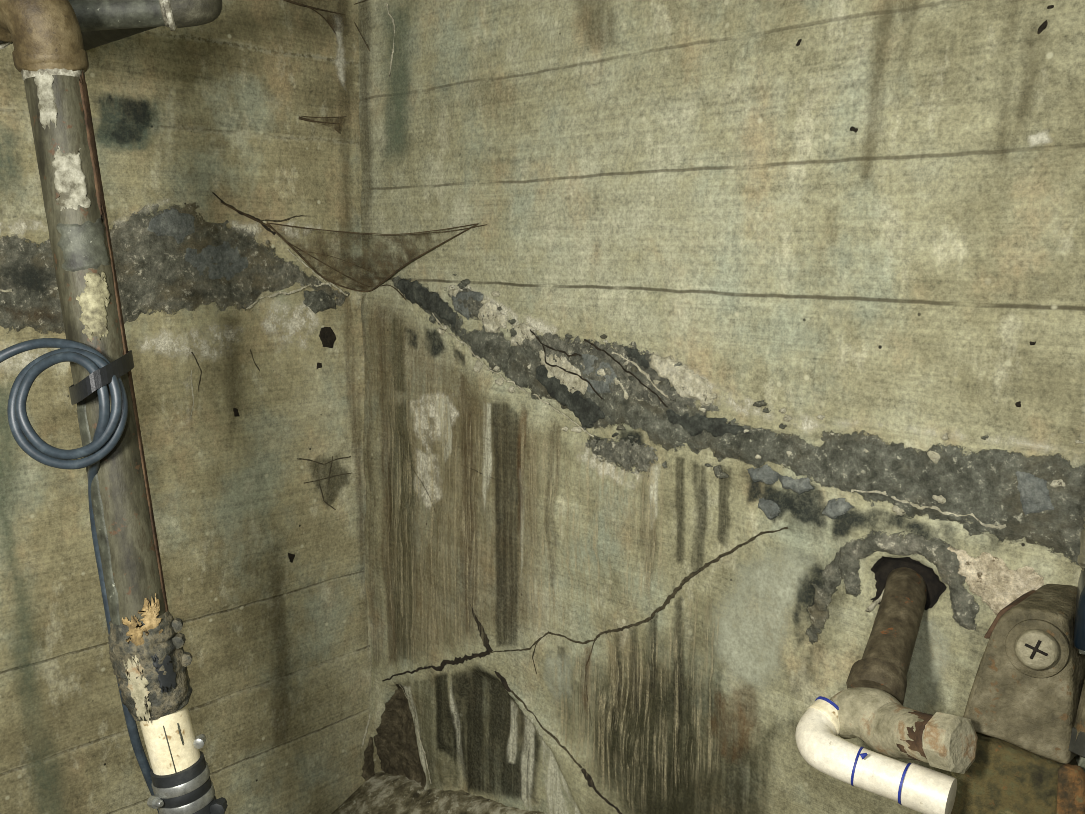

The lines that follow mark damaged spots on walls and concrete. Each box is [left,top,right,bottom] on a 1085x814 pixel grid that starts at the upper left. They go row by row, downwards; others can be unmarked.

peeling [51,146,91,211]
spalling [0,234,65,335]
spalling [76,202,350,342]
spalling [319,327,336,348]
leakage [389,331,464,363]
leakage [388,390,555,650]
spalling [392,274,1085,713]
leakage [748,478,930,540]
leakage [794,567,824,623]
crack [382,527,788,814]
spalling [361,684,432,789]
leakage [404,667,581,814]